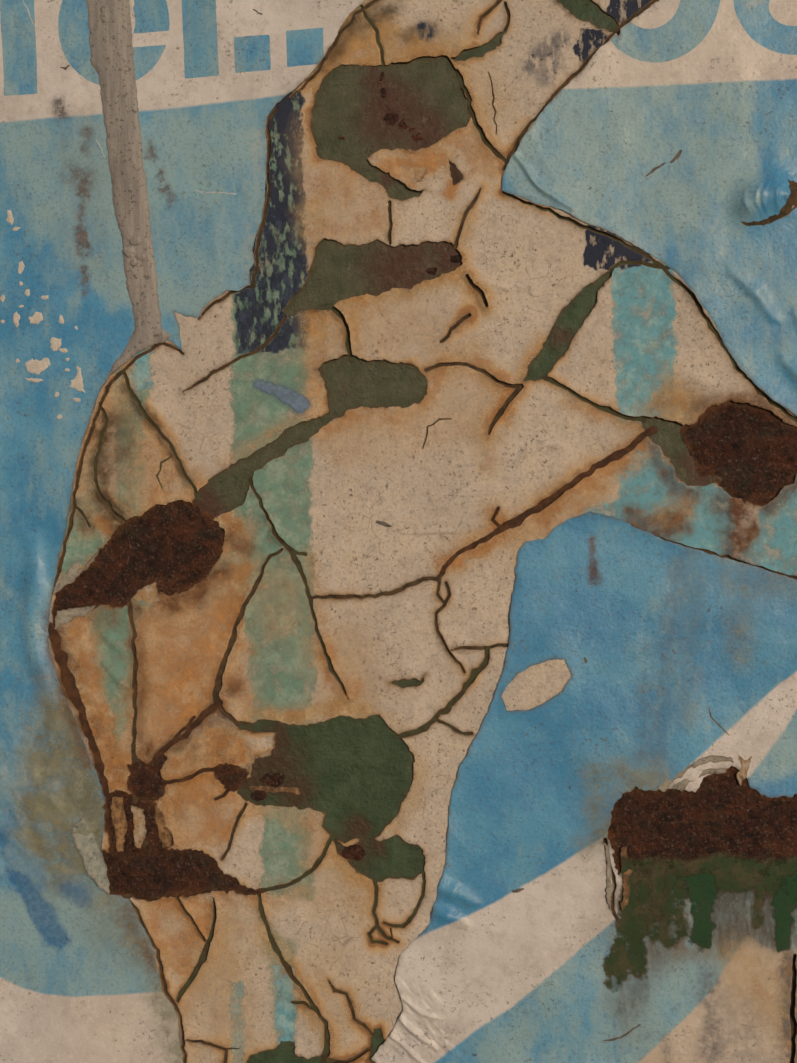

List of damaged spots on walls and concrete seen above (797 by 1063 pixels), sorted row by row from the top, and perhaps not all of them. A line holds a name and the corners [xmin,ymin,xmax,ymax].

peeling [311,31,505,201]
peeling [283,239,463,316]
crack [454,0,797,423]
peeling [193,355,427,517]
corrosion [314,353,523,441]
corrosion [651,377,797,558]
crack [128,274,658,860]
corrosion [48,432,372,978]
peeling [237,715,425,882]
corrosion [603,755,797,910]
crack [125,893,240,1063]
crack [258,831,375,1063]